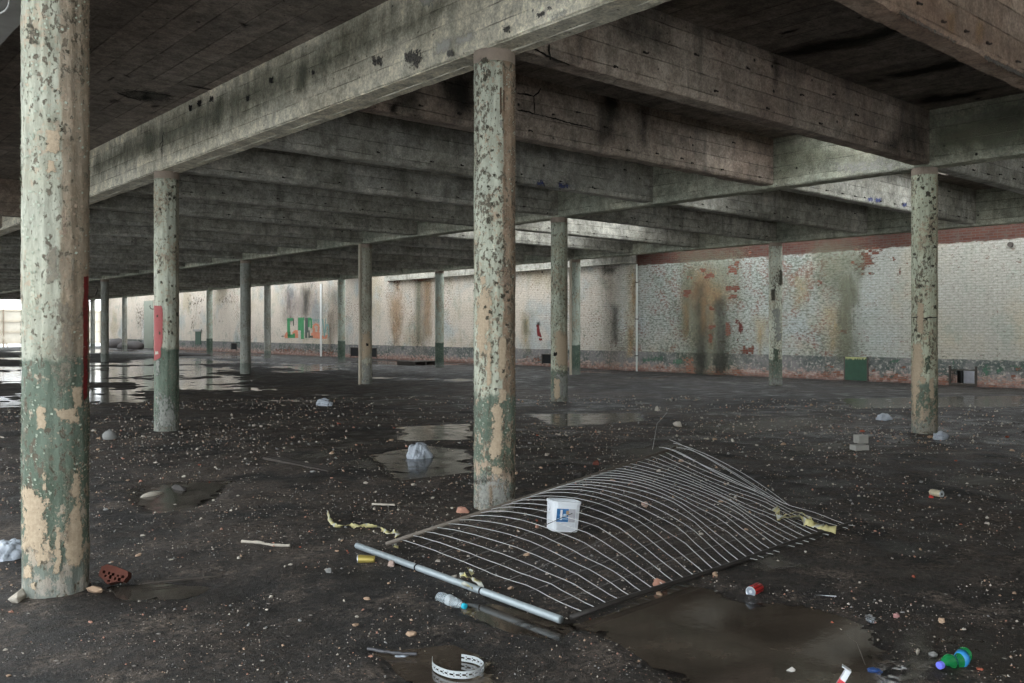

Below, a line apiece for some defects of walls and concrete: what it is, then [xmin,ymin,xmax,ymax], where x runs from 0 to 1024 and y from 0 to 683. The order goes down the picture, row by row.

spalling [404,49,423,70]
crack [517,88,590,128]
peeling [19,0,91,590]
peeling [473,57,543,475]
leakage [686,264,727,365]
peeling [725,251,752,299]
peeling [850,244,882,275]
peeling [872,178,948,420]